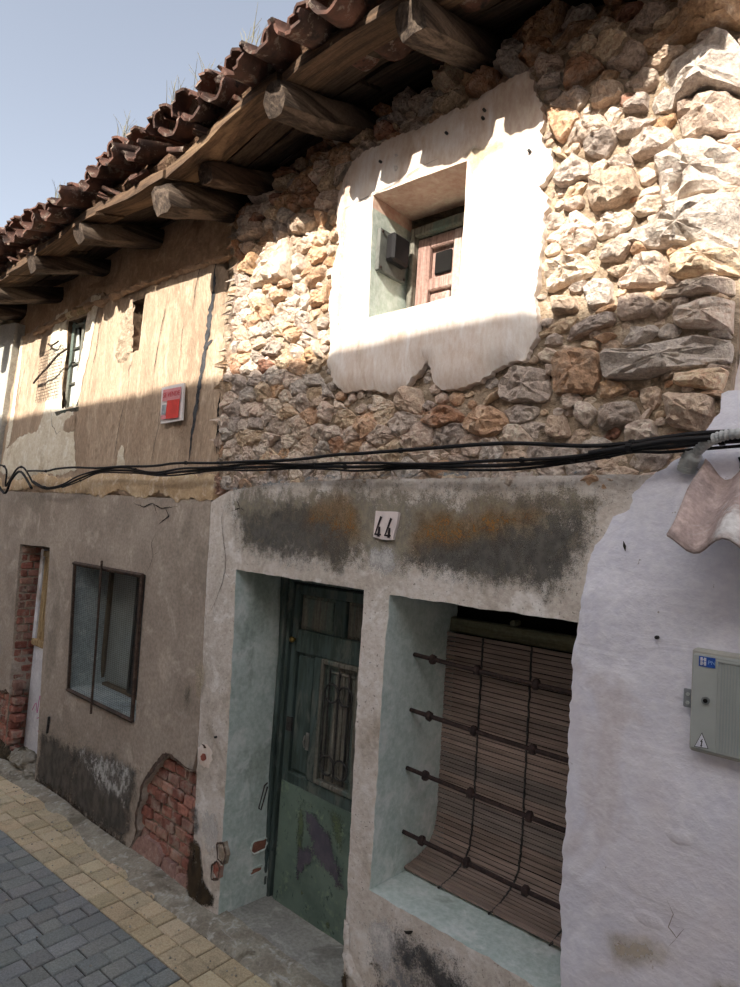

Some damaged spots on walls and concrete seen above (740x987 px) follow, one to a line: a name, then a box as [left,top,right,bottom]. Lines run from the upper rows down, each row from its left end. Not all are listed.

crack [114,264,220,459]
flaking render [116,445,125,466]
crack [136,503,178,573]
water stain [229,472,596,602]
spalling [0,676,37,780]
water stain [35,733,136,845]
spalling [129,743,213,890]
spalling [210,841,231,881]
water stain [369,921,467,987]